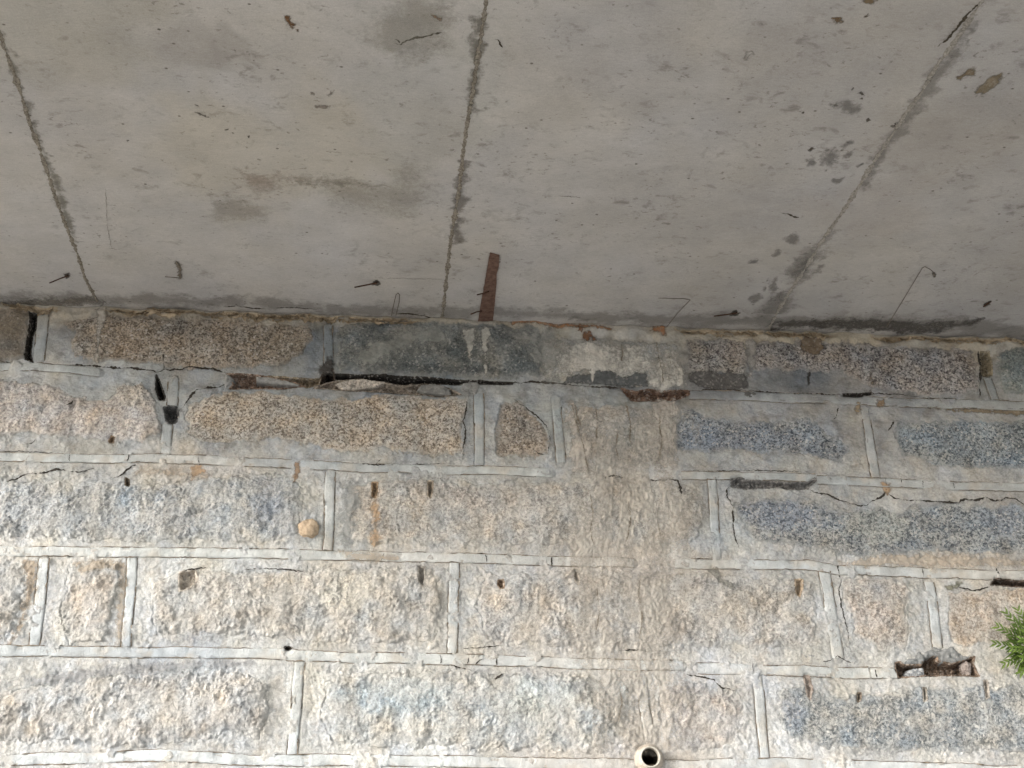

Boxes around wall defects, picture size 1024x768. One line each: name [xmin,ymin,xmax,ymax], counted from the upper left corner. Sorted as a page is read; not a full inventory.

crack [937,4,978,47]
crack [70,354,227,411]
crack [651,469,1023,548]
spalling [902,668,924,677]
spalling [958,661,971,677]